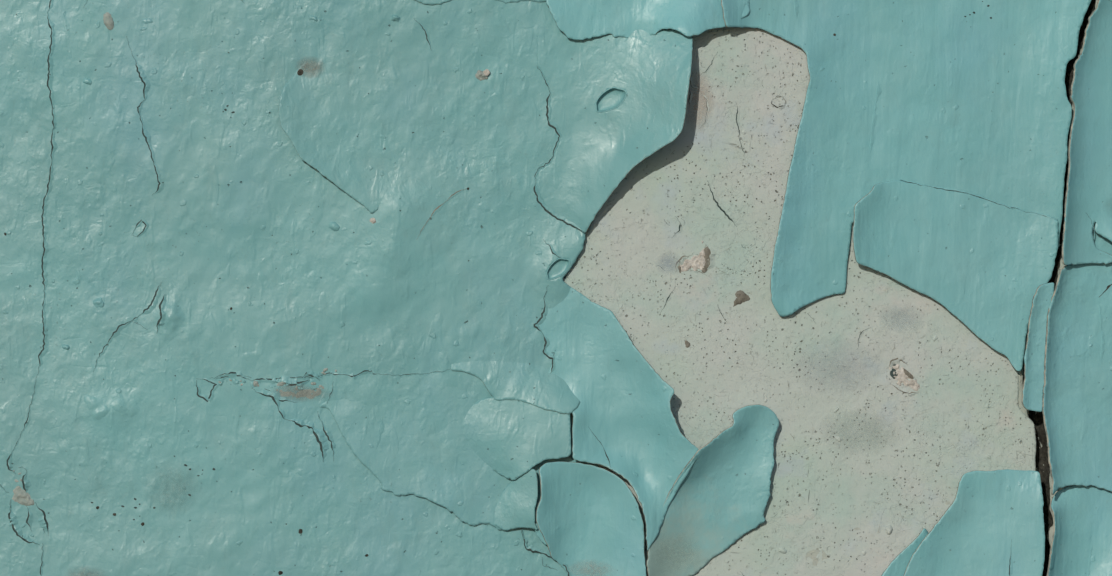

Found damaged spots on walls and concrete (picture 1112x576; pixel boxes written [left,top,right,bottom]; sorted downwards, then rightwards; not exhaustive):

crack [13,0,58,452]
crack [126,36,165,196]
spalling [196,368,337,403]
crack [210,369,450,462]
peeling [278,61,391,214]
crack [534,285,555,374]
crack [533,65,585,258]
peeling [320,0,1112,576]
crack [900,0,1112,290]
crack [1029,410,1053,576]